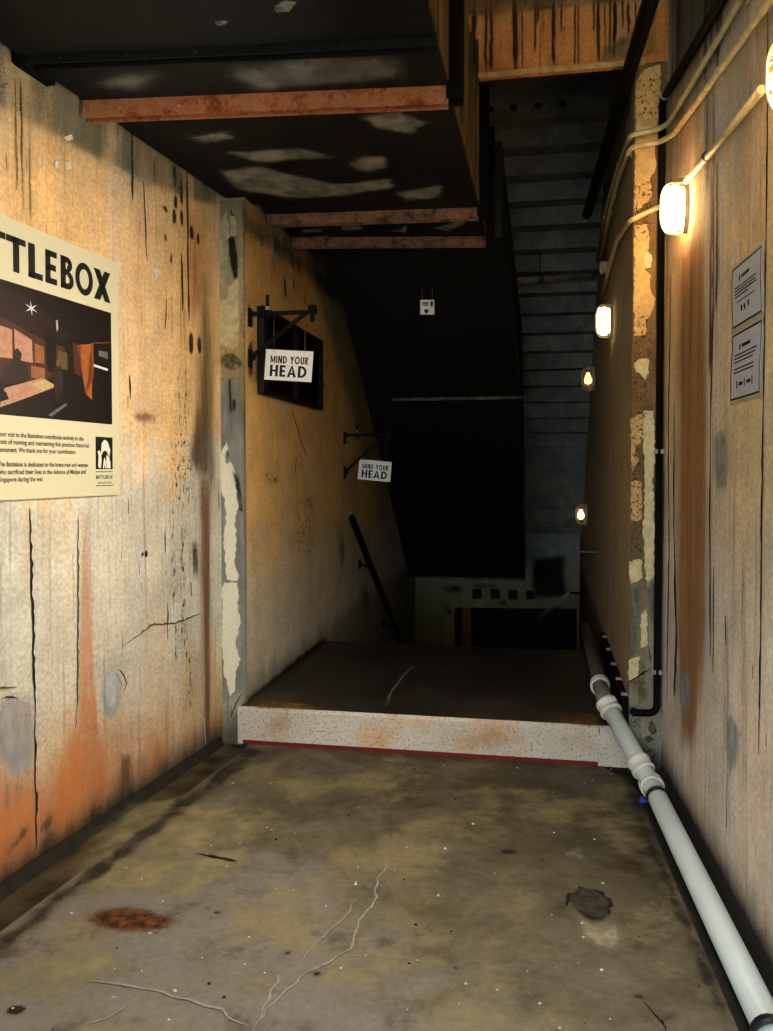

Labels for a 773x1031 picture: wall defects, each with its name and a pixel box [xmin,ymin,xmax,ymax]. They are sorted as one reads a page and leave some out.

crack [84,855,389,1030]